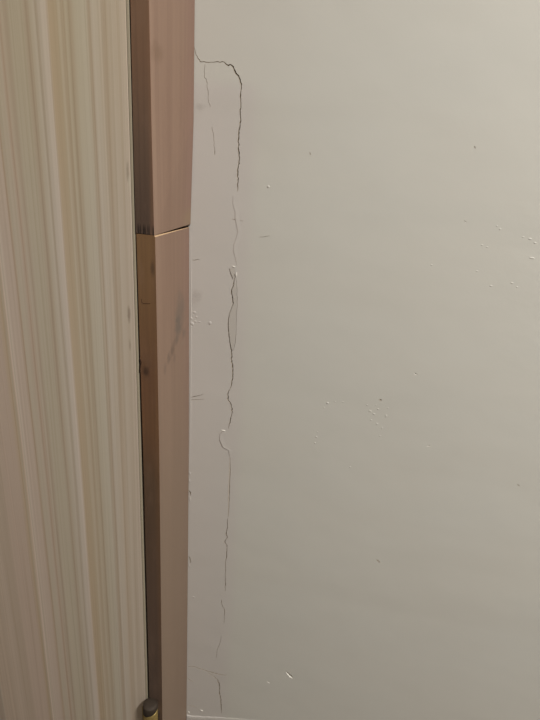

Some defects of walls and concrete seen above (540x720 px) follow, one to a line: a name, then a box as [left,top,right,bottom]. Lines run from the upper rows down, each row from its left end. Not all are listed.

crack [194,47,242,191]
crack [221,266,238,616]